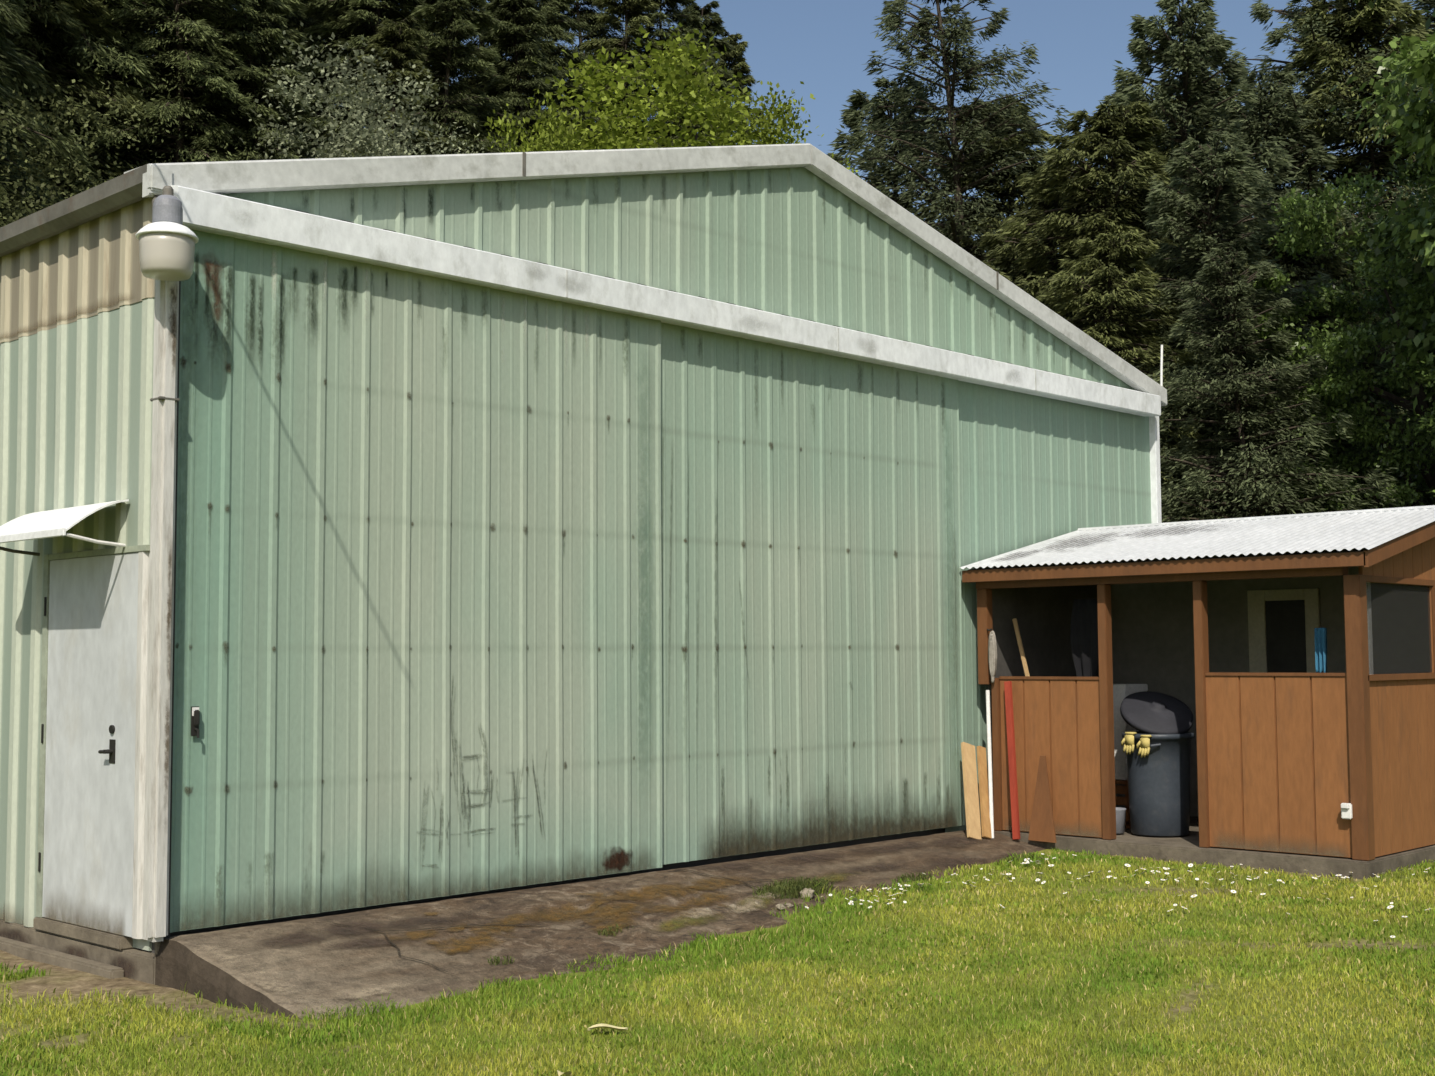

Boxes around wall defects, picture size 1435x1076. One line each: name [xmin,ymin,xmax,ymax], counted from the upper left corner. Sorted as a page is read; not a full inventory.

leakage [195,257,232,338]
leakage [250,263,284,353]
rust [603,848,629,870]
leakage [707,812,980,871]